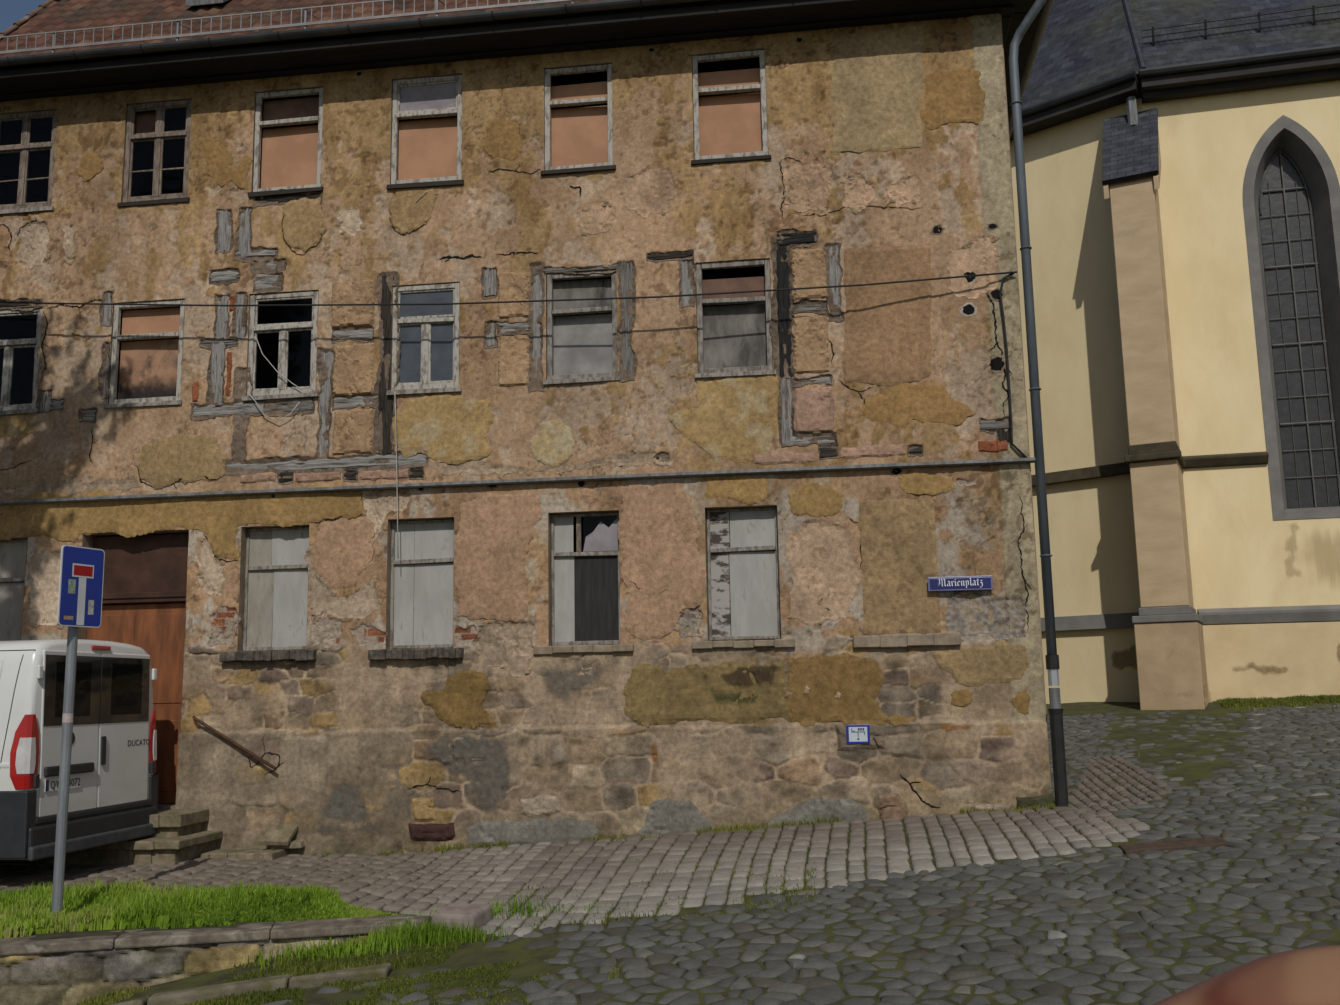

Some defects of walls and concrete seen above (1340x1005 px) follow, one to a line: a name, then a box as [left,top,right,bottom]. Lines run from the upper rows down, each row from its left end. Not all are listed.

spalling [782,160,922,214]
spalling [947,234,1000,299]
spalling [753,228,924,465]
crack [986,293,1011,416]
peeling [0,189,697,649]
spalling [978,416,1013,452]
crack [1017,498,1031,628]
water stain [722,665,776,686]
spalling [1236,663,1287,673]
crack [900,775,940,808]